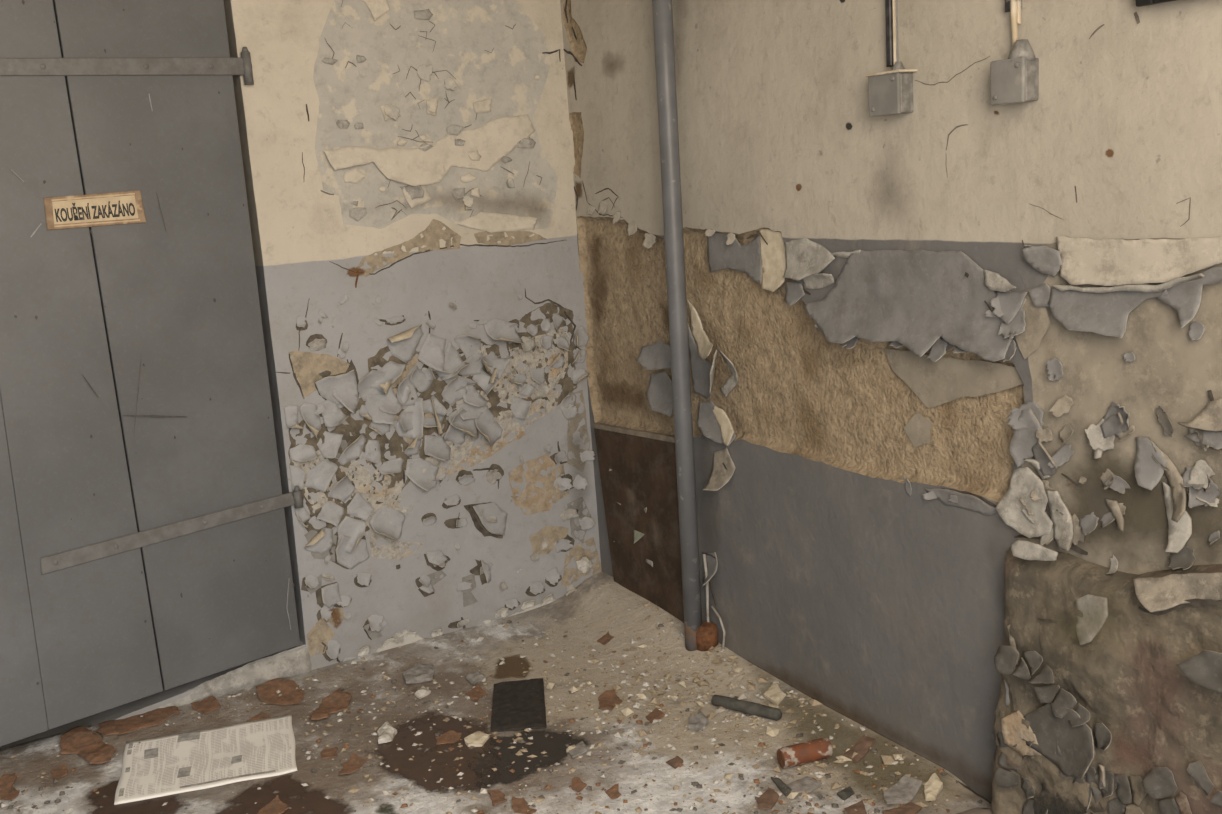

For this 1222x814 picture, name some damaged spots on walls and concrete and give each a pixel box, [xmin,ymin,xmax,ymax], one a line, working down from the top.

peeling [276,0,675,662]
flaking render [683,227,1222,574]